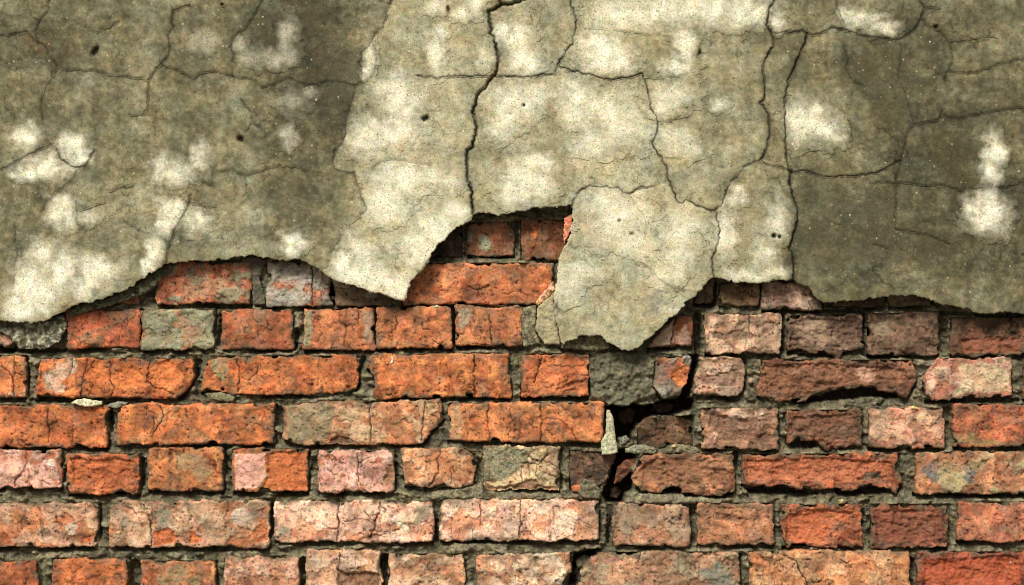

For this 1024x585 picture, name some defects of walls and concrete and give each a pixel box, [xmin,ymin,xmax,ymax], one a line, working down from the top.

crack [0,0,431,306]
crack [416,0,1024,292]
spalling [0,263,175,350]
spalling [86,359,188,408]
crack [468,286,528,296]
spalling [521,281,609,351]
spalling [762,292,908,405]
spalling [71,457,136,492]
spalling [263,449,307,491]
crack [567,316,701,585]
spalling [744,438,944,545]
spalling [923,555,1022,585]